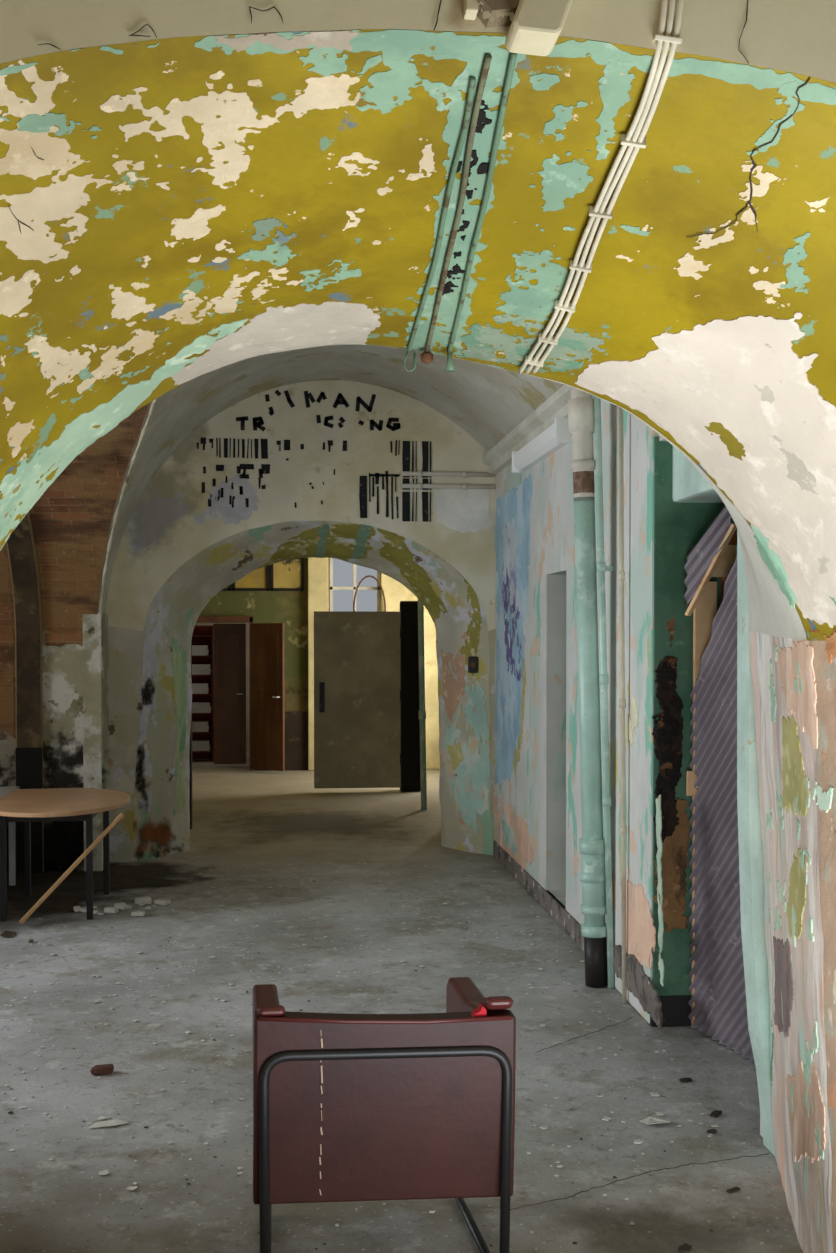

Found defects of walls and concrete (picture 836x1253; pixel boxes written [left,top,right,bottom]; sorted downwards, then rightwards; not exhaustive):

crack [738,0,749,64]
peeling [0,2,514,317]
peeling [529,54,635,231]
peeling [620,224,653,236]
peeling [673,81,808,280]
crack [686,78,810,237]
peeling [748,232,811,297]
peeling [805,197,830,212]
peeling [256,524,448,622]
spalling [42,630,83,786]
damp [43,733,84,789]
spalling [434,244,836,1163]